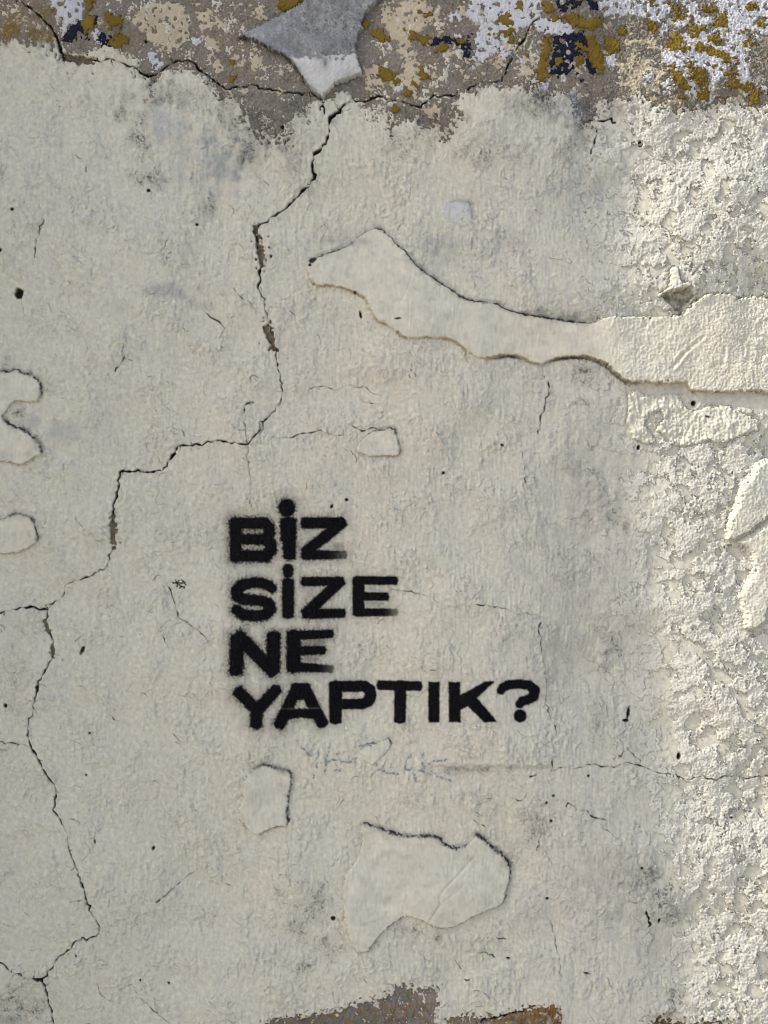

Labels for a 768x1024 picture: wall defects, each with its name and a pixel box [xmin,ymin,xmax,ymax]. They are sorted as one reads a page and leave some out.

crack [16,1,539,520]
flaking render [0,0,768,317]
crack [0,549,113,1022]
flaking render [265,983,562,1024]
peeling [581,355,768,1024]